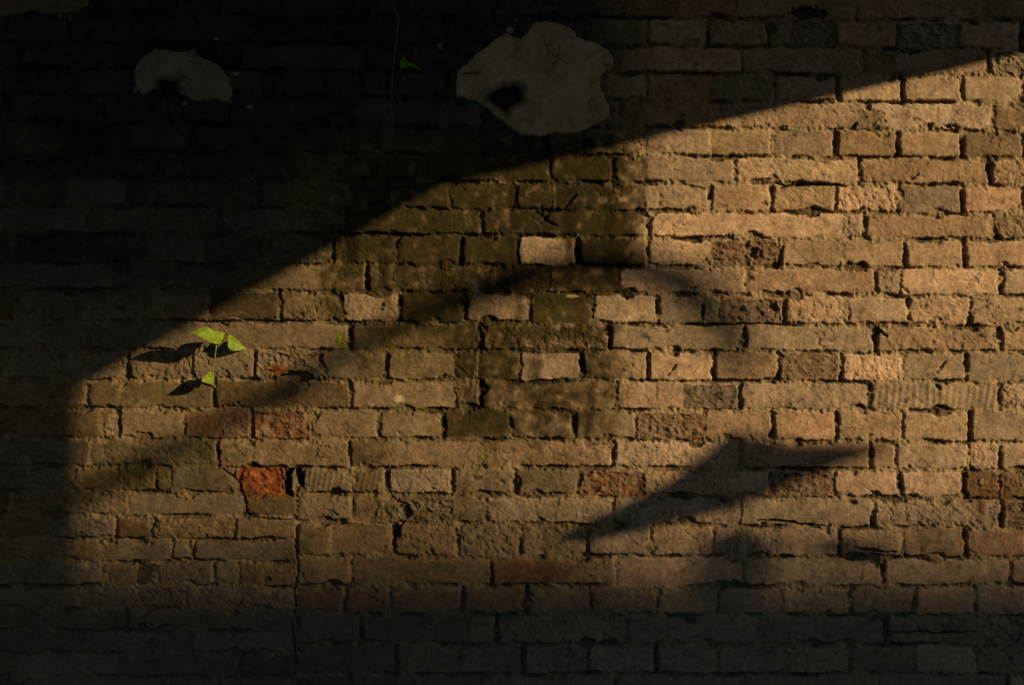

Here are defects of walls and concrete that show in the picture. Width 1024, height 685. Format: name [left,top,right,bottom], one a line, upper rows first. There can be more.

crack [386,469,405,551]
crack [292,544,305,685]